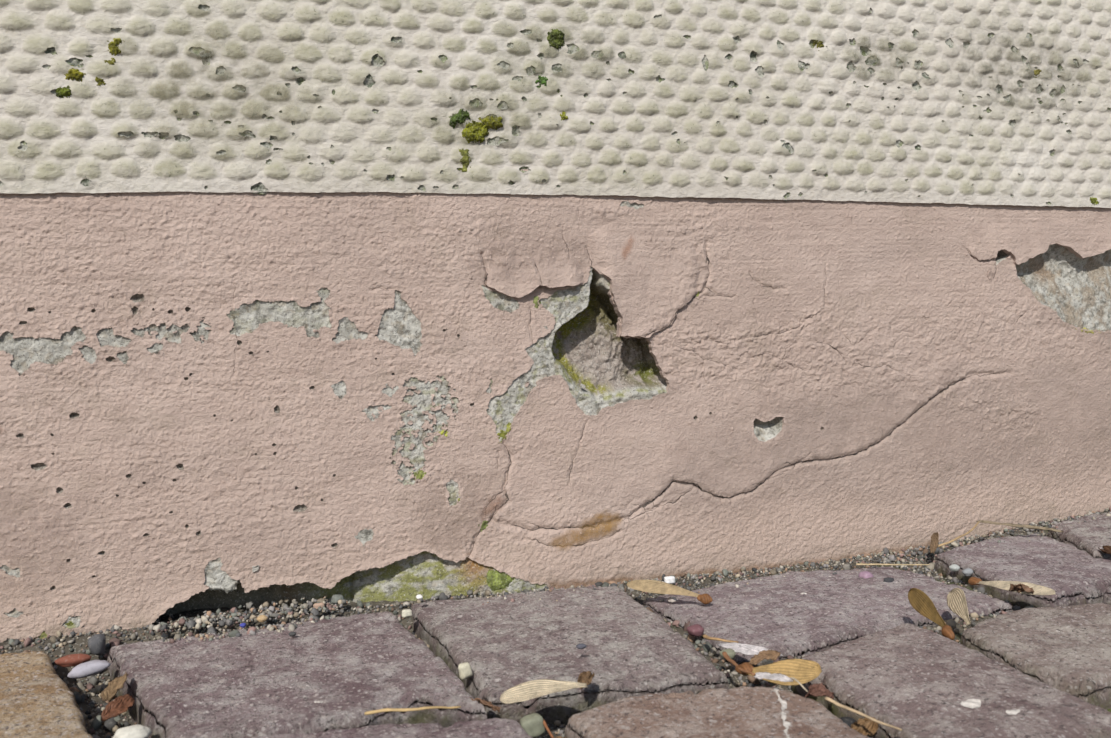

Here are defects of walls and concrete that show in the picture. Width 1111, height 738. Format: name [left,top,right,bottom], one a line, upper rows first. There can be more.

peeling [0,294,211,376]
peeling [226,288,422,356]
spalling [362,267,667,485]
spalling [987,244,1111,332]
crack [465,373,1000,554]
hole [754,417,783,442]
spalling [162,551,547,615]